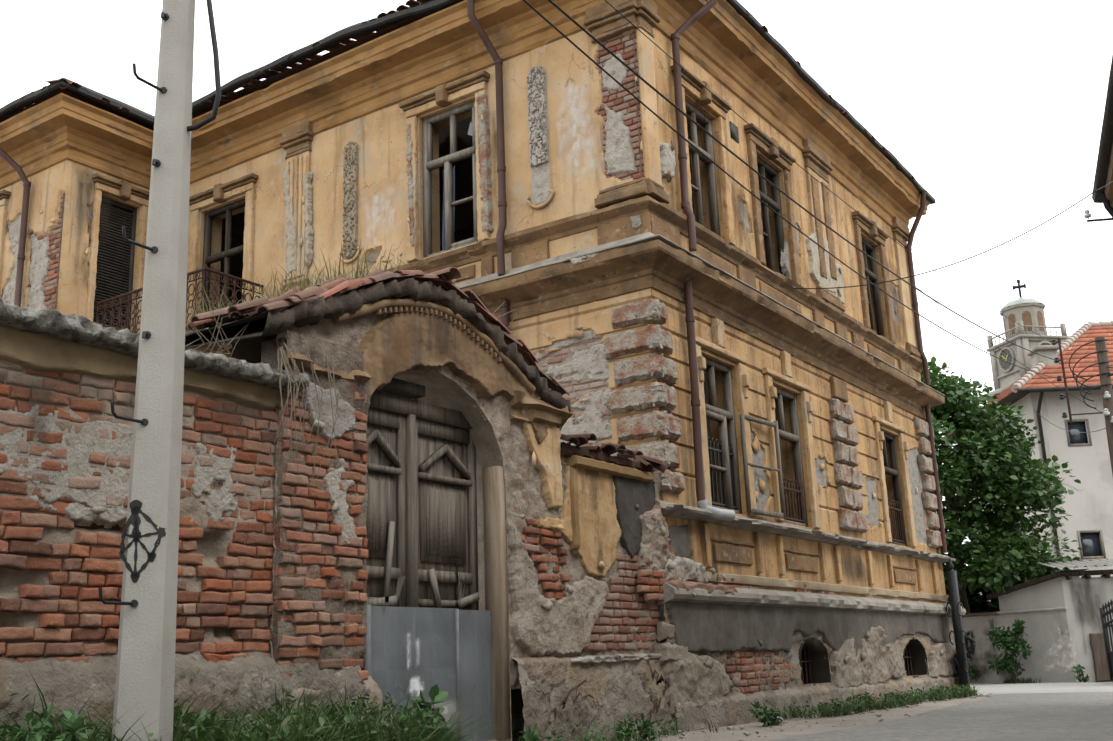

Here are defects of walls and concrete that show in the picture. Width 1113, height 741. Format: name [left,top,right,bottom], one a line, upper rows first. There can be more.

flaking render [596,30,644,181]
flaking render [659,138,676,181]
flaking render [0,192,63,311]
flaking render [302,382,356,443]
spalling [76,522,120,531]
peeling [507,330,791,716]